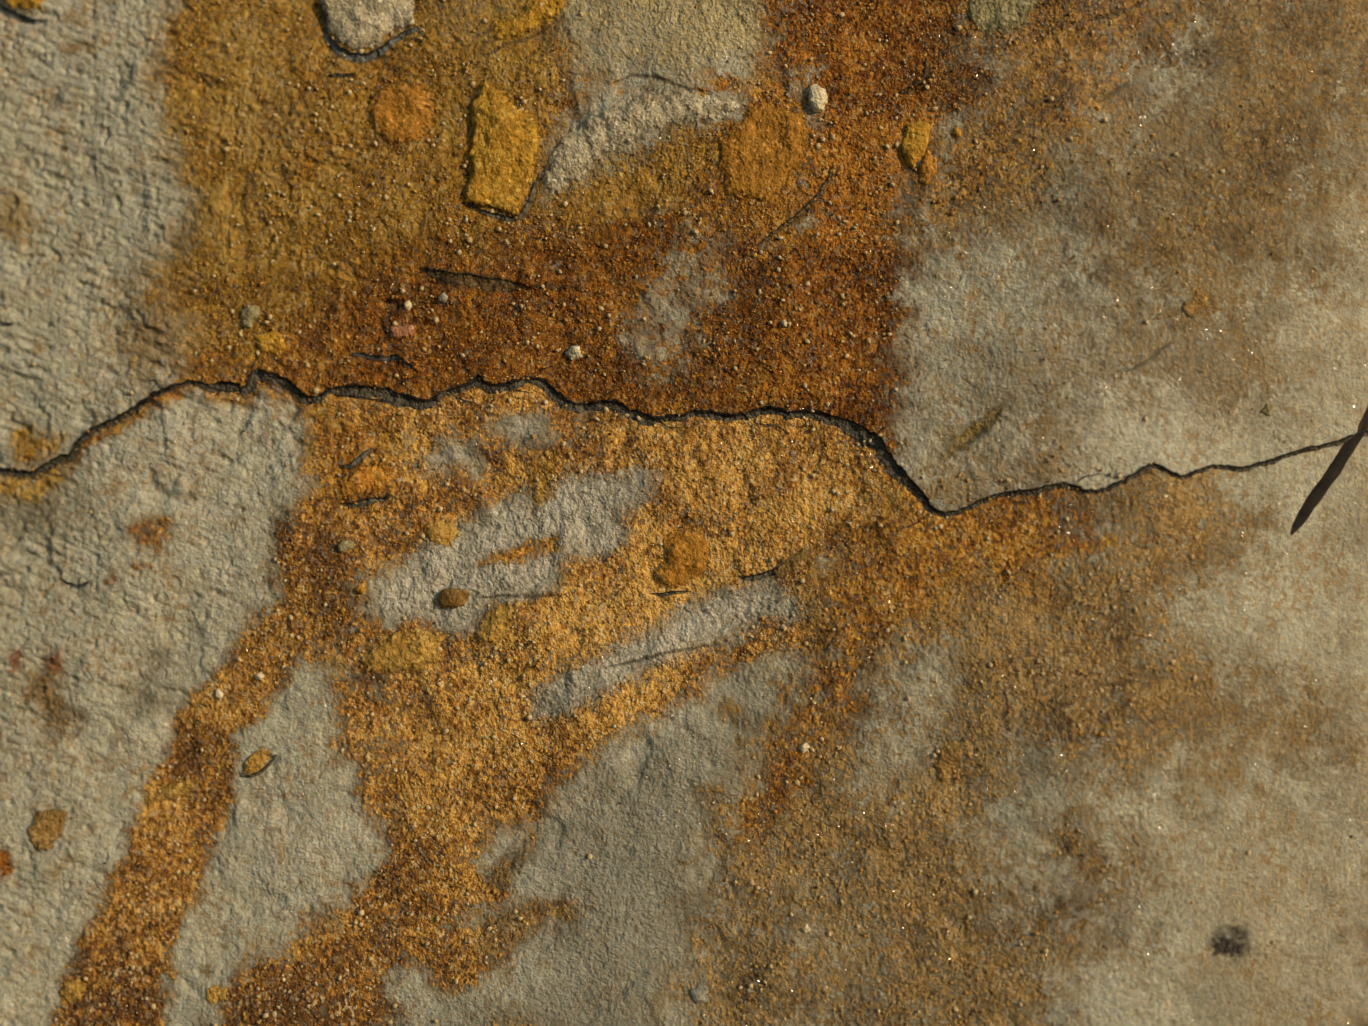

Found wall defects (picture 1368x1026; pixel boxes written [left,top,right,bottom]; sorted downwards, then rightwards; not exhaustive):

corrosion [7,650,85,737]
crack [0,352,1368,529]
corrosion [48,383,1359,1026]
corrosion [144,0,1368,453]
peeling [595,0,1368,1026]